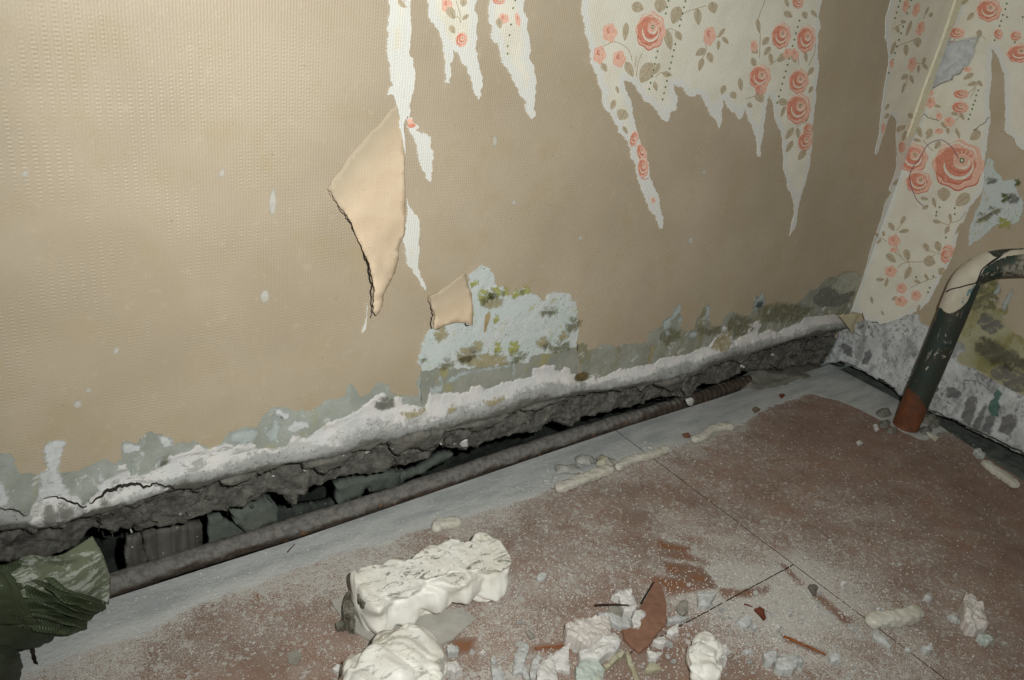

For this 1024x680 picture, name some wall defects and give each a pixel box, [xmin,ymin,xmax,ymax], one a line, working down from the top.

peeling [386,0,416,128]
peeling [427,0,537,119]
water stain [470,281,530,324]
water stain [435,326,448,341]
water stain [440,341,525,370]
water stain [536,317,582,353]
water stain [841,344,872,365]
water stain [957,278,1024,395]
spalling [0,277,858,562]
water stain [947,387,1017,435]
crack [0,471,274,538]